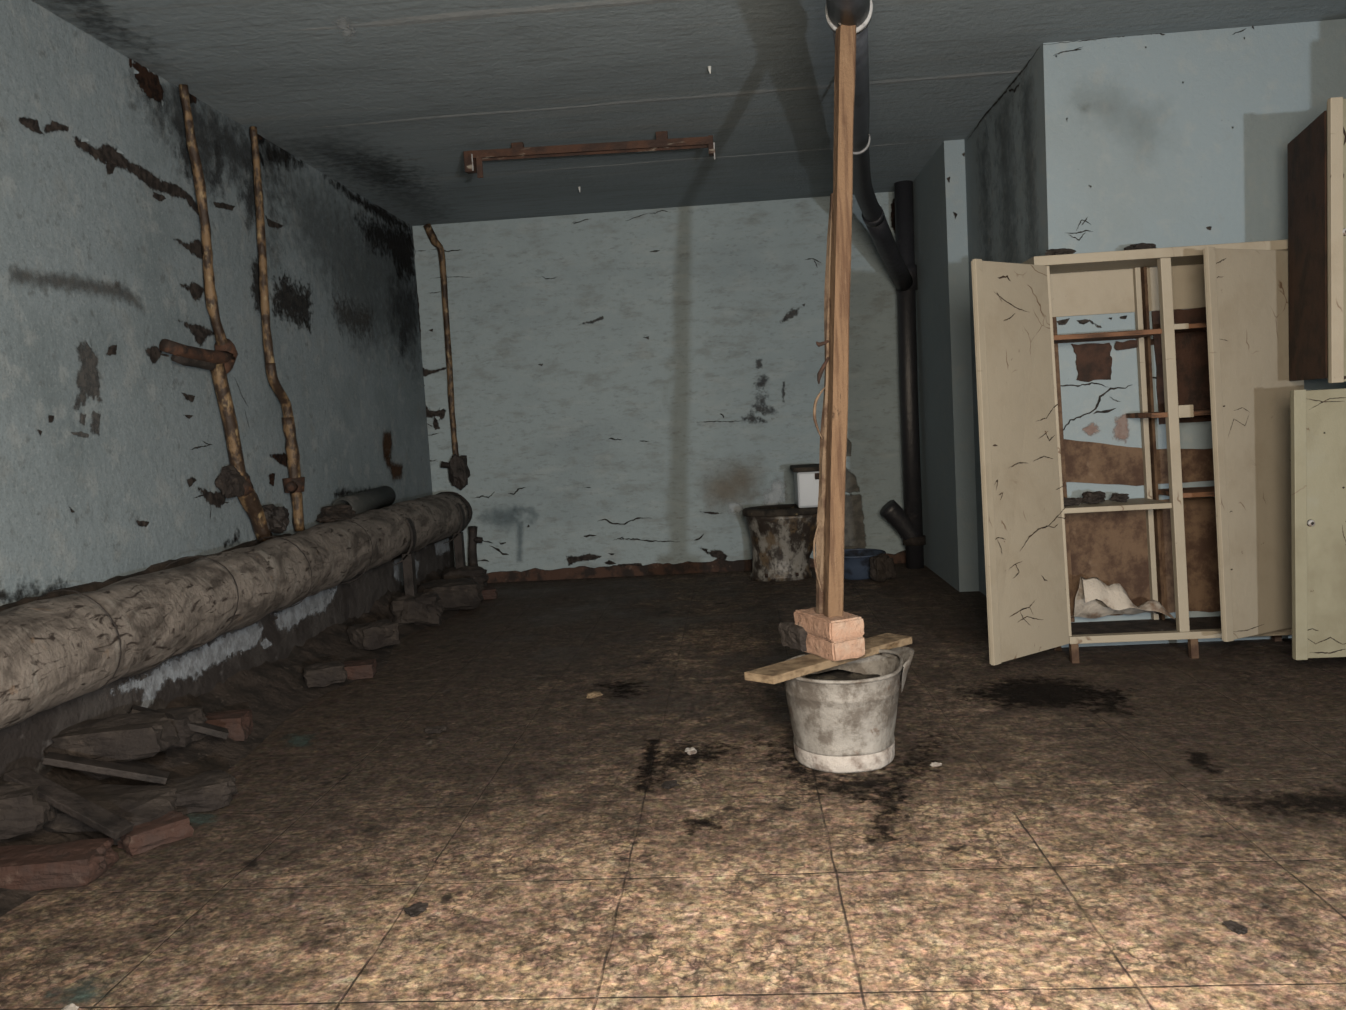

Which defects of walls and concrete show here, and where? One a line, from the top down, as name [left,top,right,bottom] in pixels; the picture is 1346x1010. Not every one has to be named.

flaking render [129,58,164,106]
flaking render [19,117,235,215]
damp [324,177,418,354]
peeling [72,338,117,438]
damp [764,481,786,505]
damp [963,676,1132,715]
damp [636,739,737,792]
damp [758,738,949,842]
damp [1209,788,1346,820]